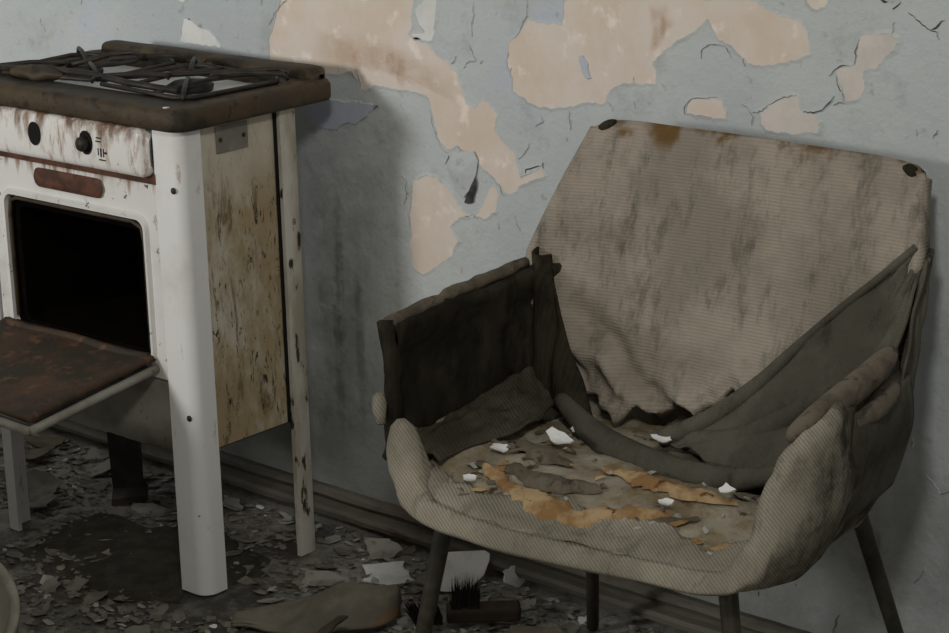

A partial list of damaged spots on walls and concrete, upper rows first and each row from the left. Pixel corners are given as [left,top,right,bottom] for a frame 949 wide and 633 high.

peeling [180,17,222,50]
peeling [267,0,548,277]
peeling [505,0,812,112]
peeling [684,95,729,122]
peeling [758,91,823,138]
crack [741,40,860,126]
peeling [834,29,902,105]
crack [881,0,944,40]